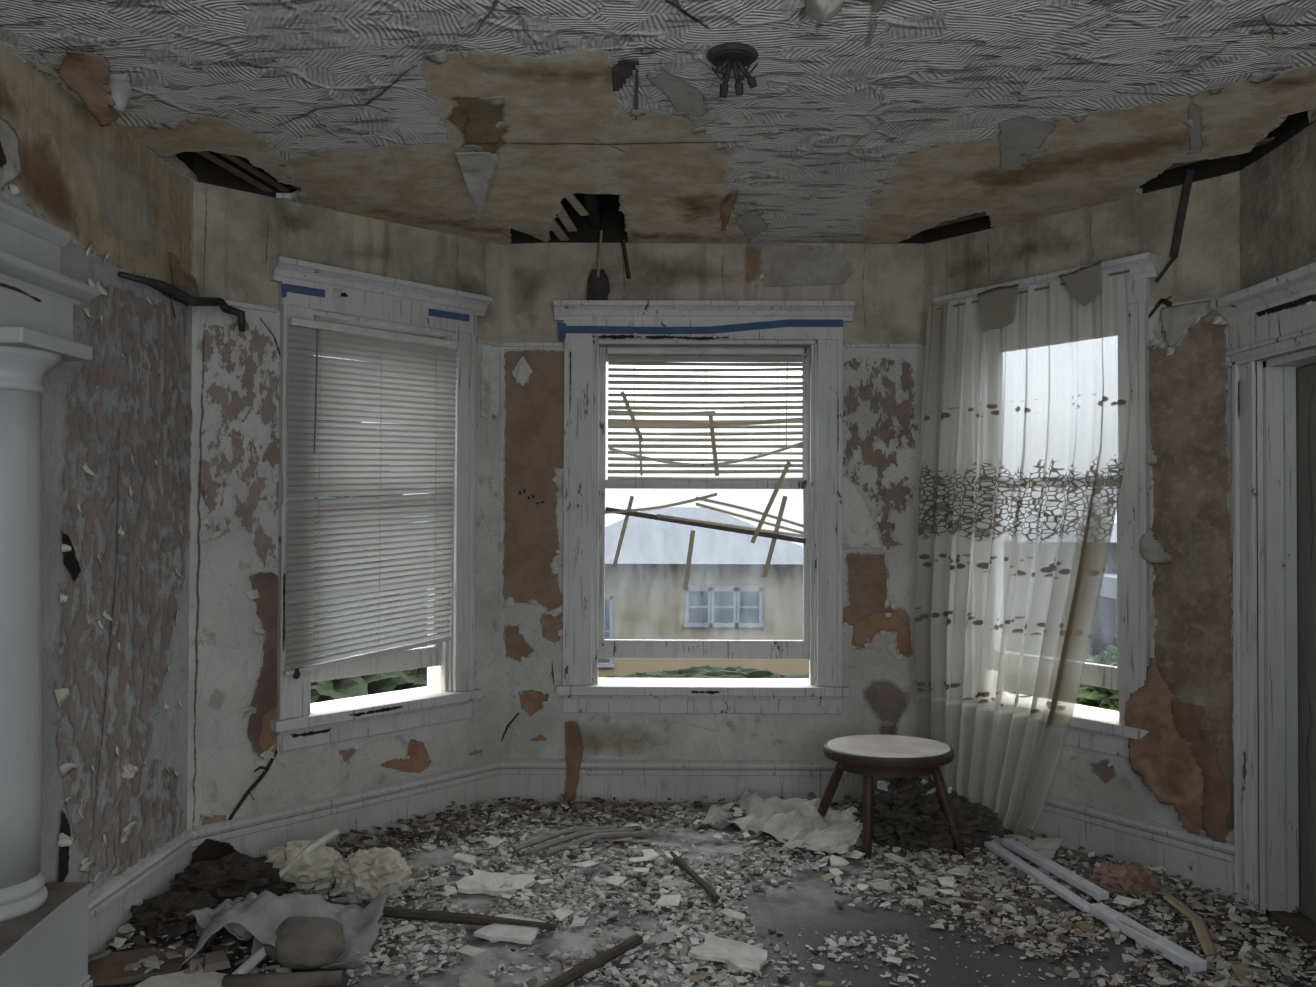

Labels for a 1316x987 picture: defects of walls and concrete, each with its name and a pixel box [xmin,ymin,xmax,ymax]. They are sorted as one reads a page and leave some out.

water stain [86,141,153,246]
water stain [449,95,511,158]
flaking render [0,45,749,883]
peeling [843,356,918,661]